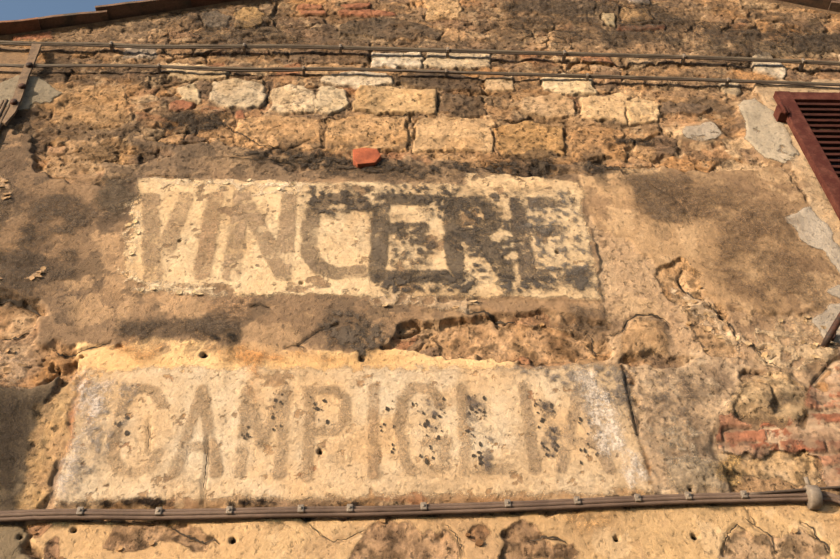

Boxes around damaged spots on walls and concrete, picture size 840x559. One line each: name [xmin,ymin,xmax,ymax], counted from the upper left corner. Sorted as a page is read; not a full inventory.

water stain [0,174,138,309]
water stain [219,147,619,297]
water stain [628,172,820,312]
flaking render [0,302,45,389]
water stain [79,384,105,417]
water stain [114,313,241,350]
spalling [371,291,595,367]
water stain [558,304,613,330]
crack [677,273,782,369]
flaking render [654,257,840,486]
mould [96,497,172,508]